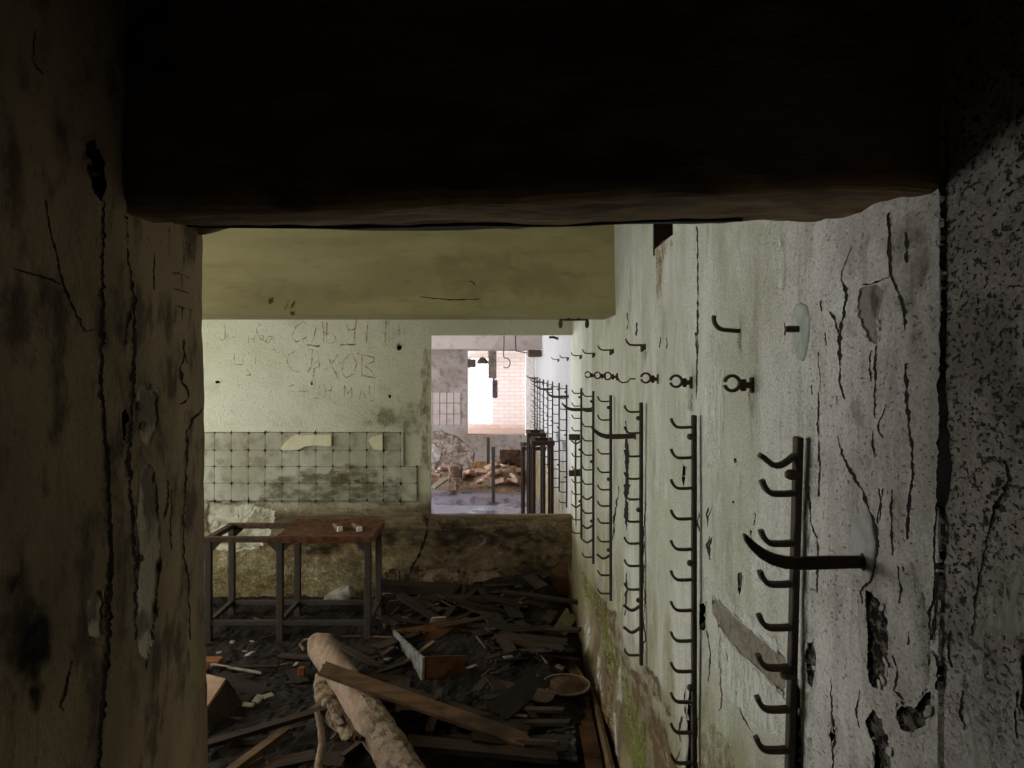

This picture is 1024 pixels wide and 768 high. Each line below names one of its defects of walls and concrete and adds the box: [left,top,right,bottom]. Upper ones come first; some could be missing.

spalling [82,133,110,207]
crack [187,218,743,400]
flaking render [855,278,886,349]
crack [13,200,155,768]
flaking render [119,380,163,669]
leakage [259,465,401,504]
crack [808,120,1013,730]
leakage [582,572,677,768]
peeling [698,596,818,768]
flaking render [863,587,934,768]